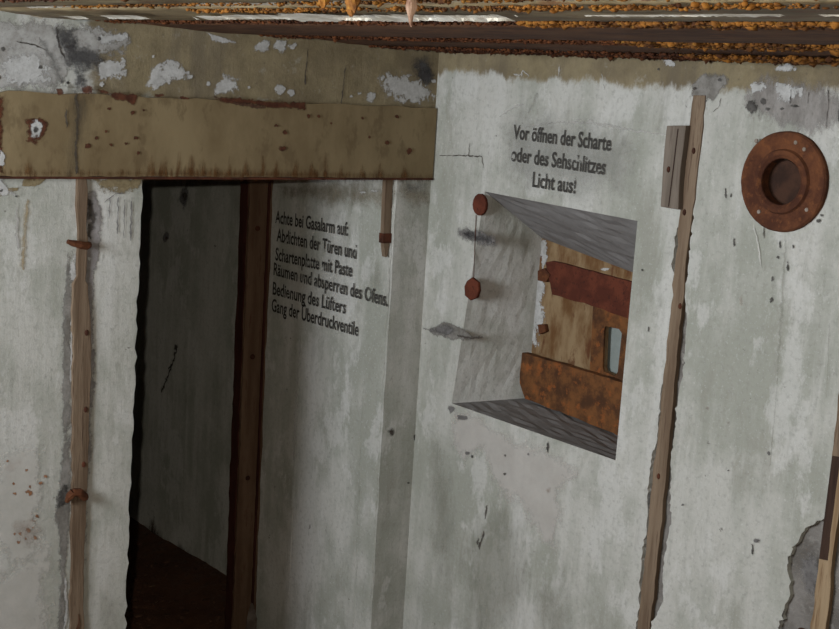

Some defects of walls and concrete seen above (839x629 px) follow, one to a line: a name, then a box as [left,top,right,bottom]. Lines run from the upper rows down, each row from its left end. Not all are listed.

rust [0,0,839,32]
rust [259,35,839,68]
peeling [145,55,193,91]
peeling [350,72,436,105]
peeling [745,63,839,134]
flaking render [779,520,824,629]
flaking render [829,537,839,629]